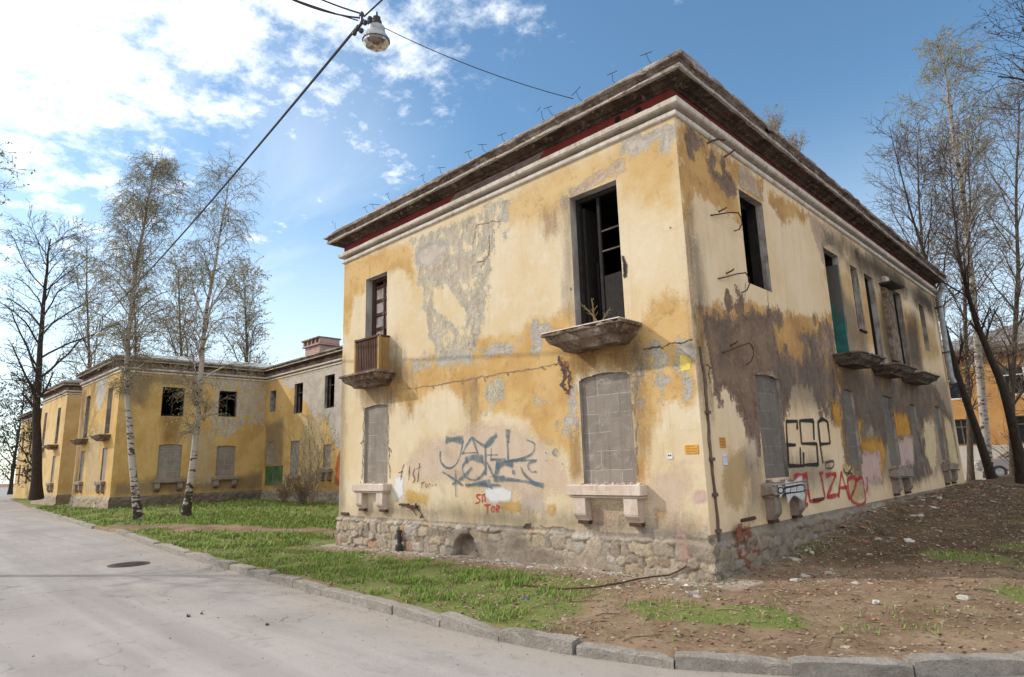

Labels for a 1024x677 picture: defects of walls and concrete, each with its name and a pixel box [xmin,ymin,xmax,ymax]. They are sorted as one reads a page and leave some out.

spalling [327,56,945,280]
crack [361,355,572,480]
peeling [45,116,962,497]
crack [643,339,692,350]
leakage [702,284,947,483]
flaking render [734,523,762,569]